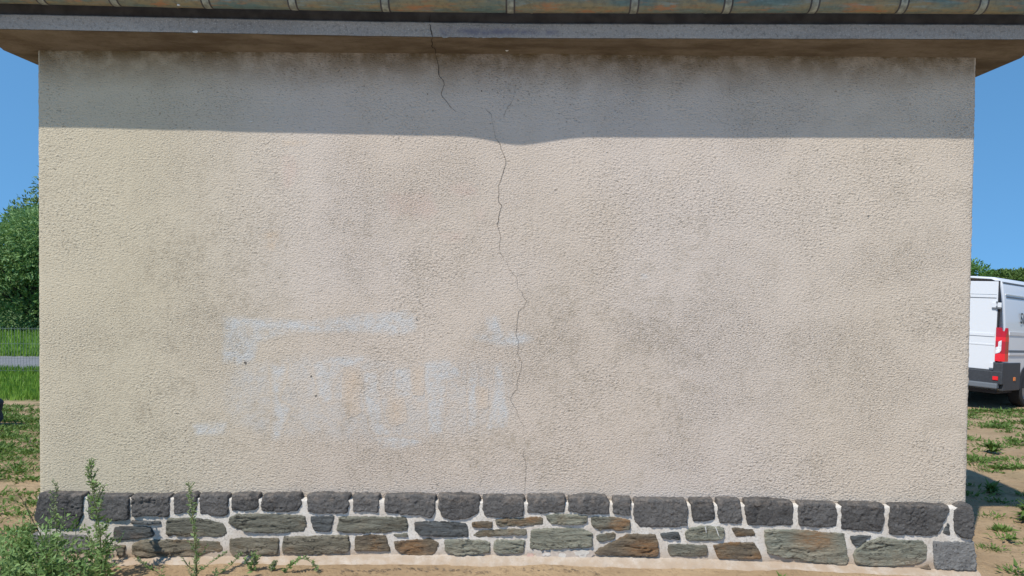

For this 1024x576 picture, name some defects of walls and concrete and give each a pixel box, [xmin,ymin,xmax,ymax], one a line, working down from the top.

crack [418,14,455,111]